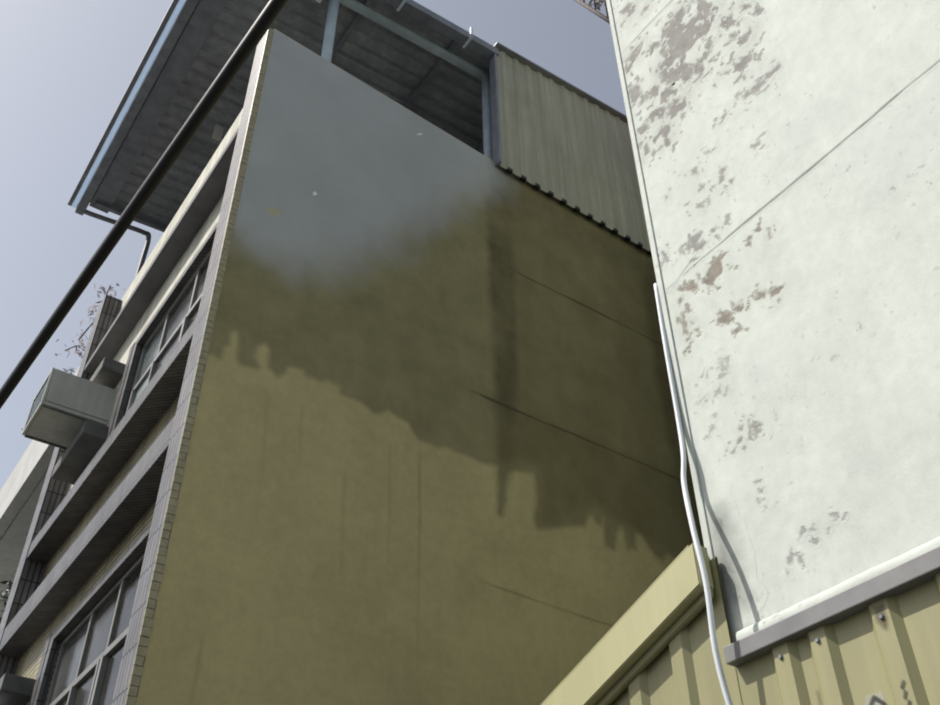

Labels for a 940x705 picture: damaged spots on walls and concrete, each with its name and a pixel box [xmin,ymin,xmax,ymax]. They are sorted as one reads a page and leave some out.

peeling [620,0,784,175]
water stain [207,29,840,676]
peeling [657,144,787,459]
peeling [750,476,769,517]
peeling [783,503,850,582]